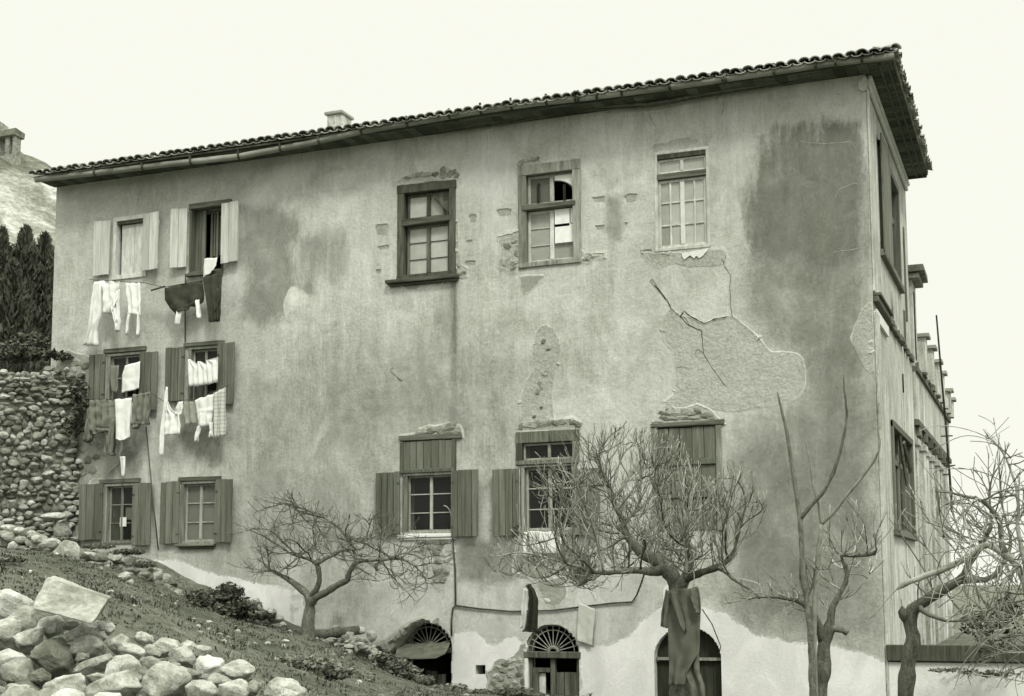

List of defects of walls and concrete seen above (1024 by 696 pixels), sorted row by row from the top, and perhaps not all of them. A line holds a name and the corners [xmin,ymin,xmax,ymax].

flaking render [397,161,461,185]
flaking render [496,228,545,295]
flaking render [640,246,731,269]
flaking render [517,323,583,430]
crack [650,251,765,387]
flaking render [650,306,807,425]
damp [741,123,868,623]
flaking render [850,302,875,374]
flaking render [398,420,465,439]
flaking render [413,540,458,593]
flaking render [485,641,529,691]